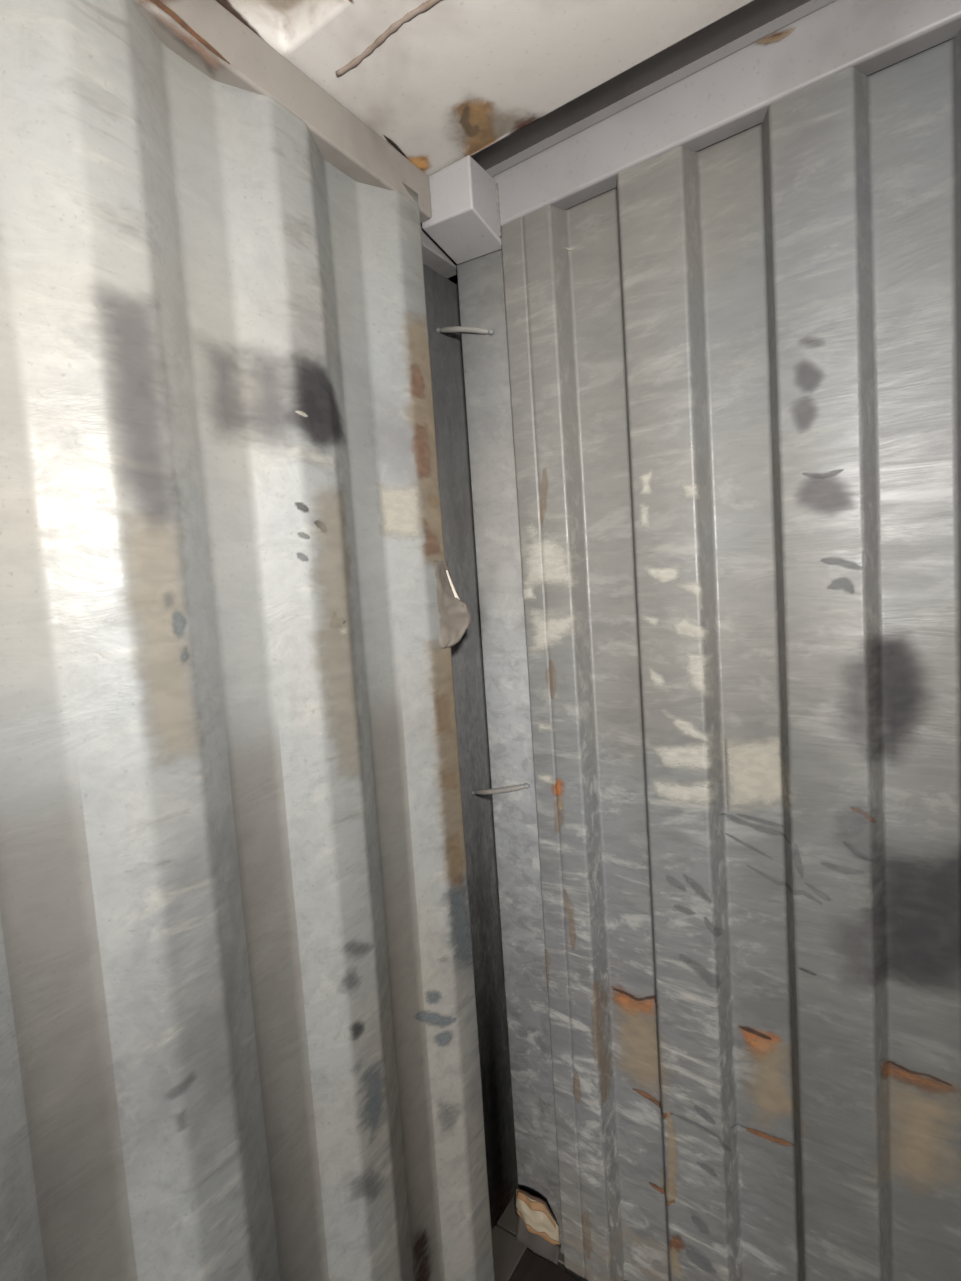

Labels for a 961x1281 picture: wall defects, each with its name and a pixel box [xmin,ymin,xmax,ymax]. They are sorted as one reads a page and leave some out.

corrosion [143,0,230,66]
corrosion [216,0,262,38]
corrosion [457,103,495,156]
leakage [874,641,921,747]
leakage [880,860,961,984]
corrosion [613,989,658,1014]
corrosion [739,1026,780,1058]
corrosion [882,1062,955,1092]